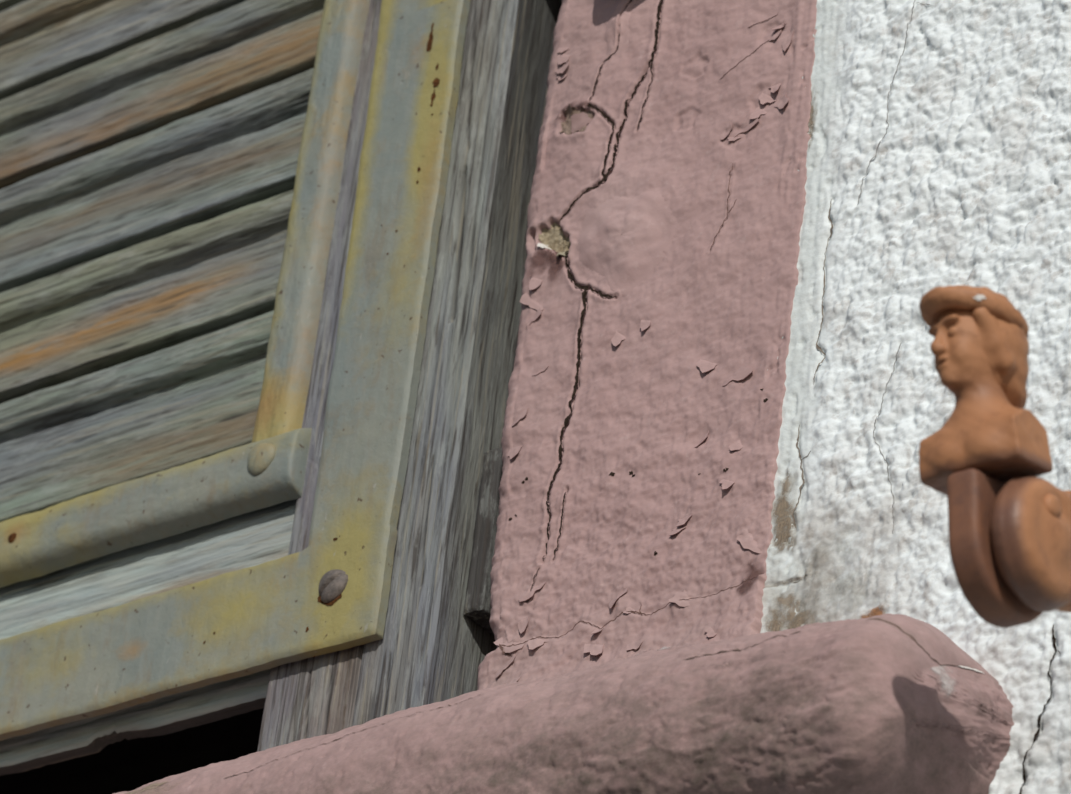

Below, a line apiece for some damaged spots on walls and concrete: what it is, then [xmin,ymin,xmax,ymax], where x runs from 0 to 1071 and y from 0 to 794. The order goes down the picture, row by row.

flaking render [560,104,594,135]
crack [559,0,662,222]
peeling [720,83,789,141]
flaking render [537,221,571,256]
peeling [520,275,544,325]
crack [530,247,616,591]
peeling [736,529,762,554]
peeling [494,617,548,683]
peeling [583,627,605,656]
crack [499,577,755,656]
peeling [669,590,692,607]
crack [1019,623,1061,794]